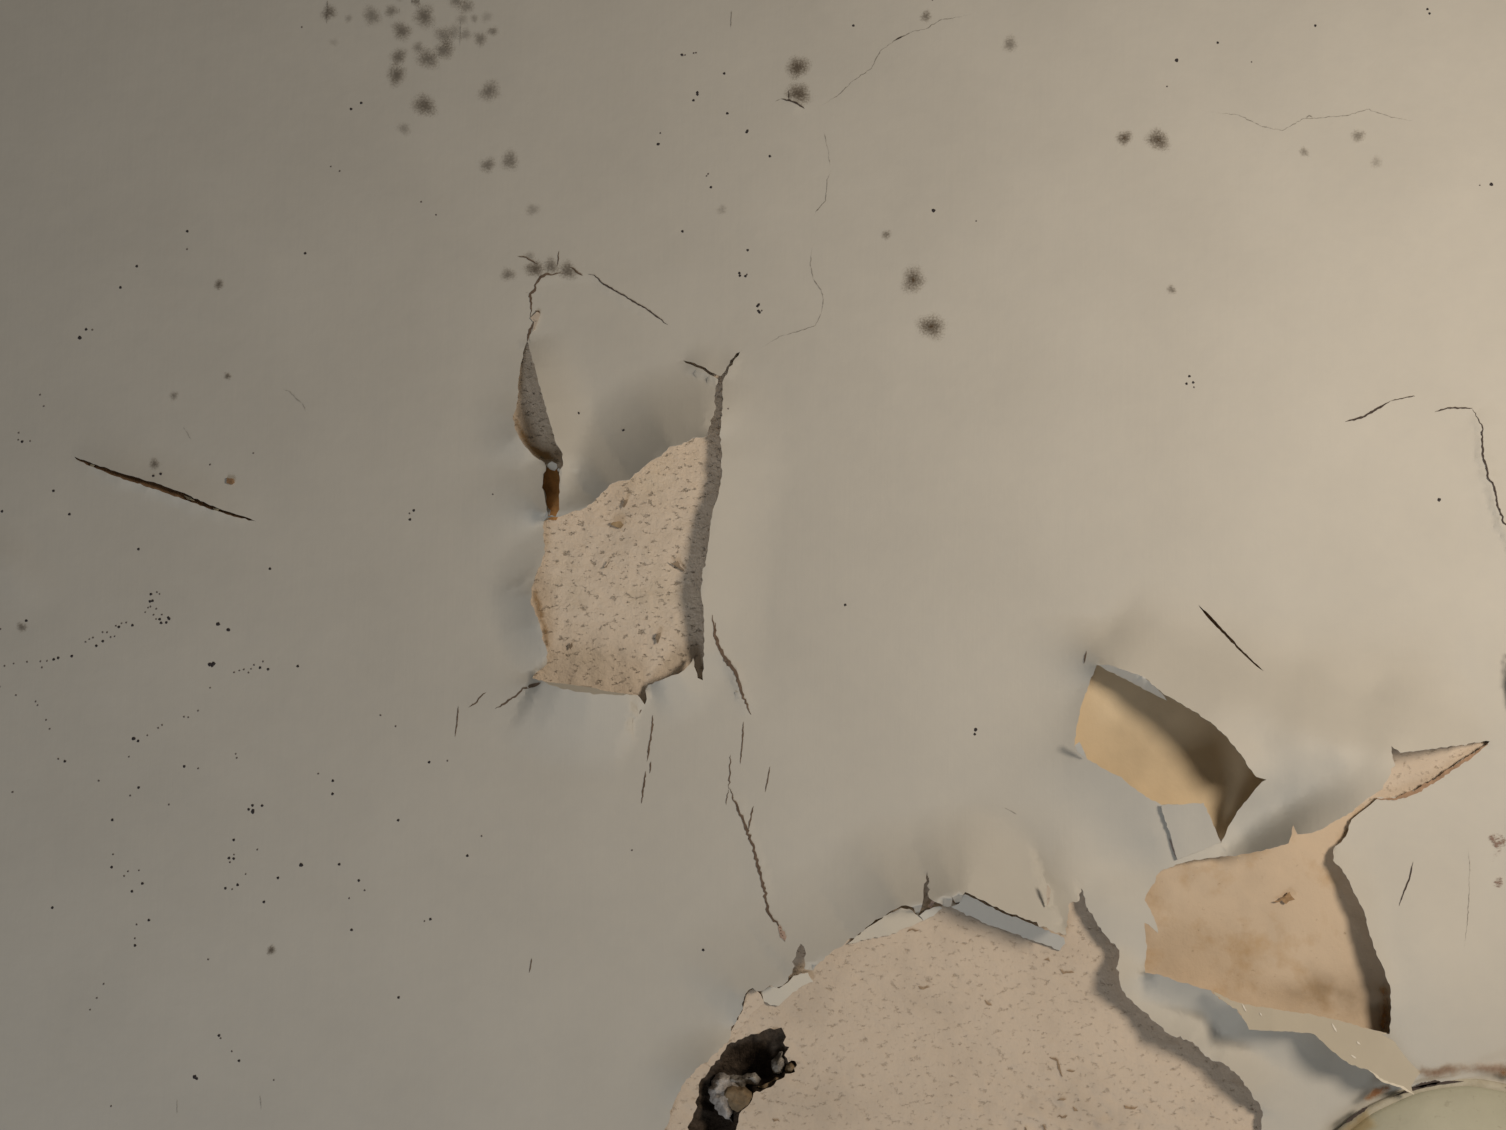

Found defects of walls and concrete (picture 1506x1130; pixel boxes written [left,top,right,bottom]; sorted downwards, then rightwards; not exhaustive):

crack [518,252,666,341]
peeling [513,286,740,704]
crack [1346,396,1506,525]
crack [712,615,786,941]
peeling [665,665,1490,1130]